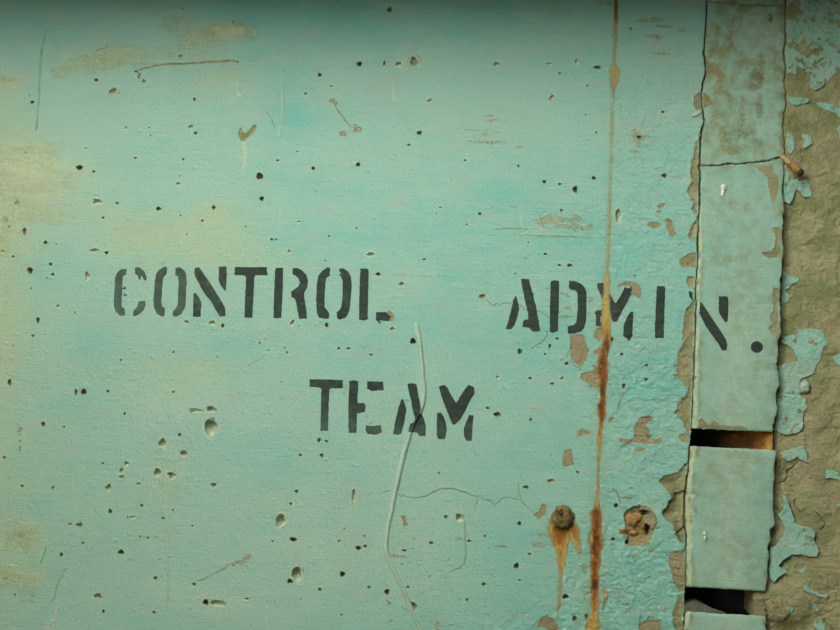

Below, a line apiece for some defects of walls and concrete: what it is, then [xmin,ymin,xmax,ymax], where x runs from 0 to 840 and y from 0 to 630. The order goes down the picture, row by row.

corrosion [610,55,619,97]
spalling [678,252,697,288]
crack [691,0,786,426]
peeling [754,164,812,204]
peeling [786,132,813,154]
peeling [785,0,840,139]
corrosion [548,222,611,630]
crack [682,446,690,585]
spalling [672,299,749,444]
peeling [768,495,819,582]
peeling [782,445,807,462]
peeling [768,271,829,435]